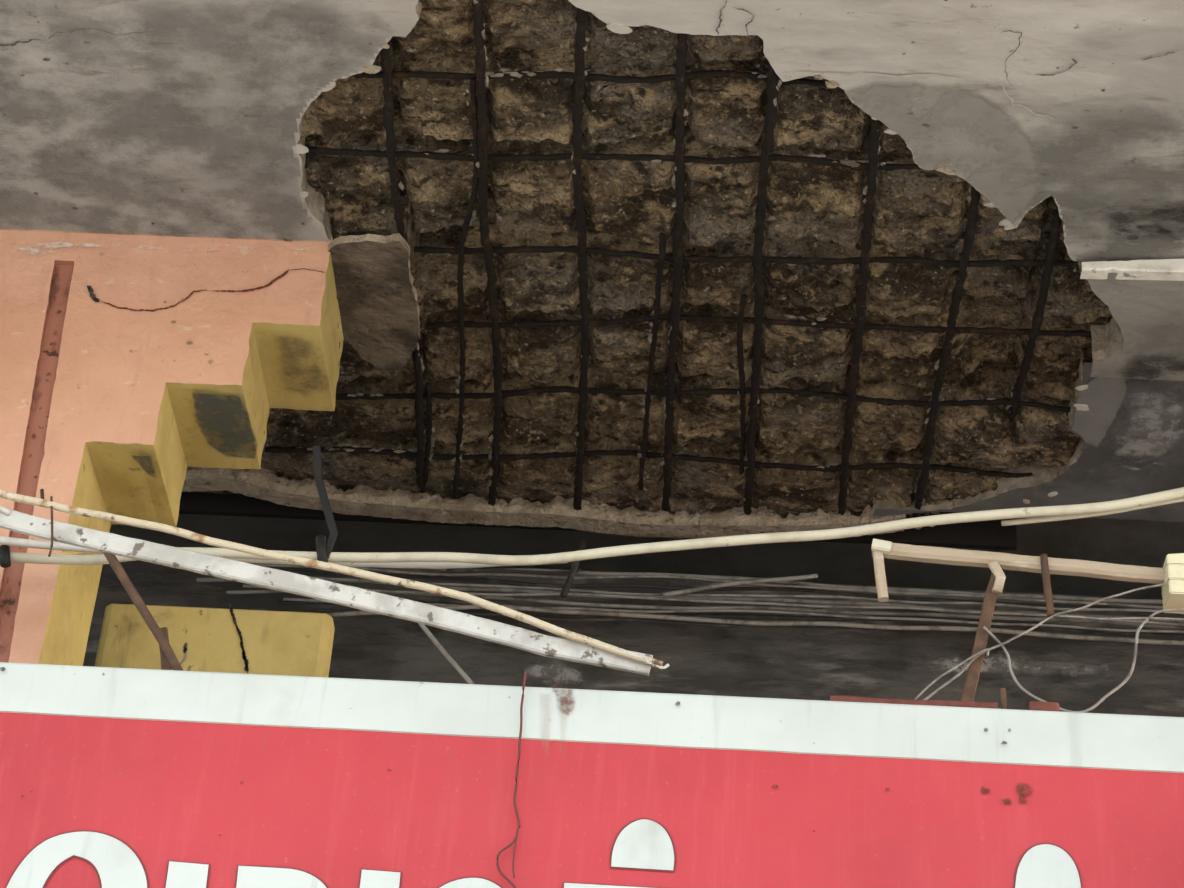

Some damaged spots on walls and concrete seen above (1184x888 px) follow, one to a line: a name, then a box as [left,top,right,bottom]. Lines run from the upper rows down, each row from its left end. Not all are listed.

crack [716,0,755,35]
damp [0,5,370,242]
damp [1022,116,1184,261]
crack [87,268,325,312]
spalling [179,0,1126,550]
crack [229,602,249,673]